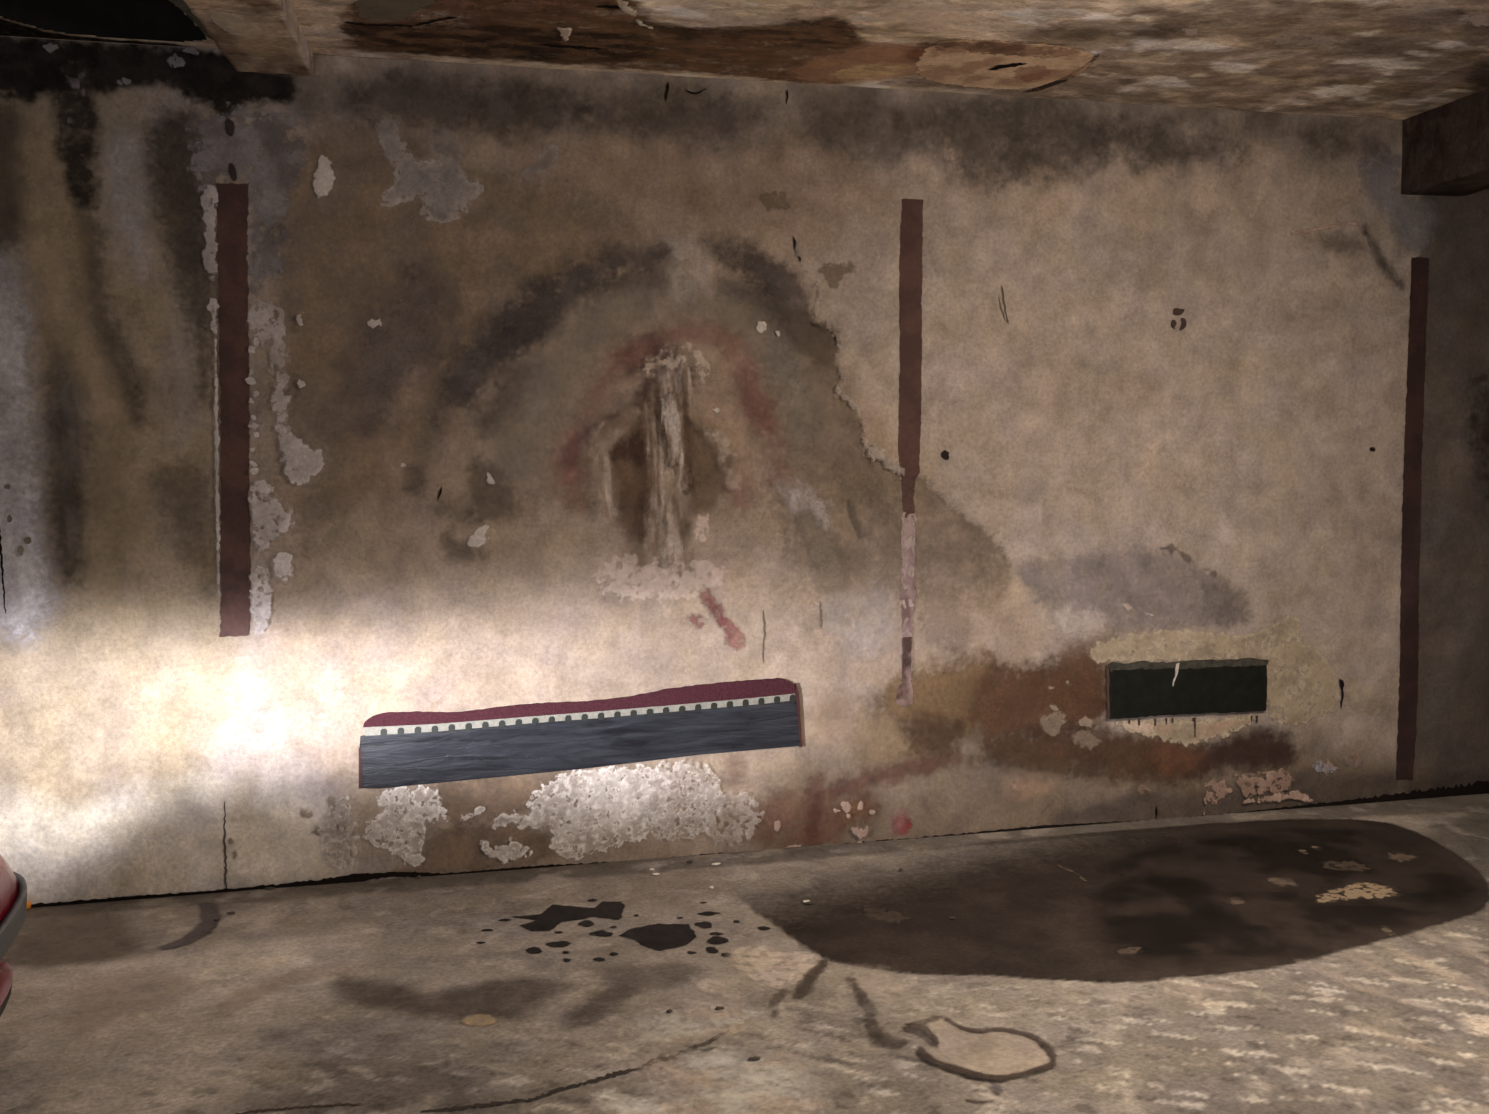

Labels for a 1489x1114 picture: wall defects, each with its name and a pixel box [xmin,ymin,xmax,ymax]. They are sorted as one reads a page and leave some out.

leakage [167,46,199,68]
flaking render [557,27,572,41]
spalling [915,40,1099,93]
peeling [375,114,484,223]
leakage [43,42,138,420]
leakage [0,113,121,641]
leakage [147,102,1006,634]
peeling [467,524,489,547]
flaking render [1090,615,1341,747]
corrosion [1170,729,1295,771]
peeling [300,760,726,873]
leakage [752,819,1489,982]